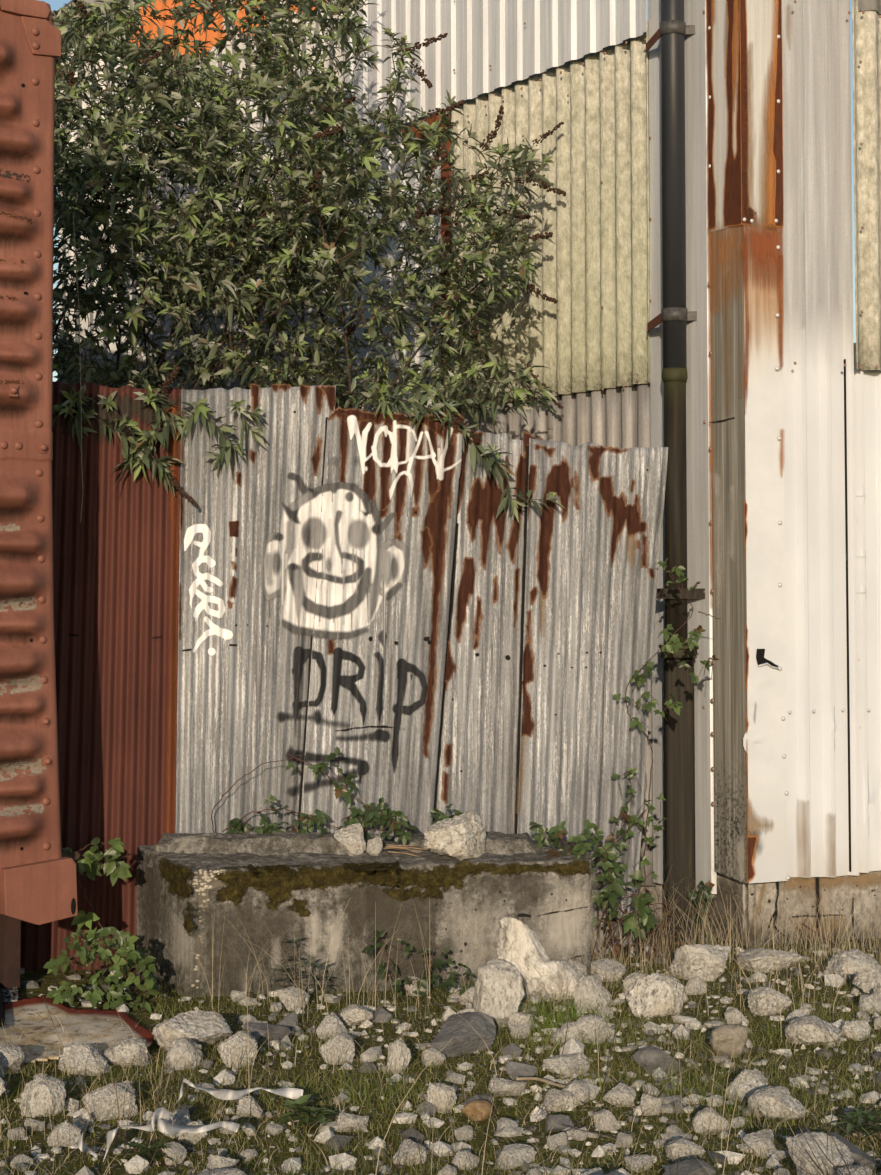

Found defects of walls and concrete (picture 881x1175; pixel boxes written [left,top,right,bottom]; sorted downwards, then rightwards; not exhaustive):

corrosion [706,0,784,597]
corrosion [58,393,184,833]
corrosion [250,384,654,813]
corrosion [737,800,769,939]